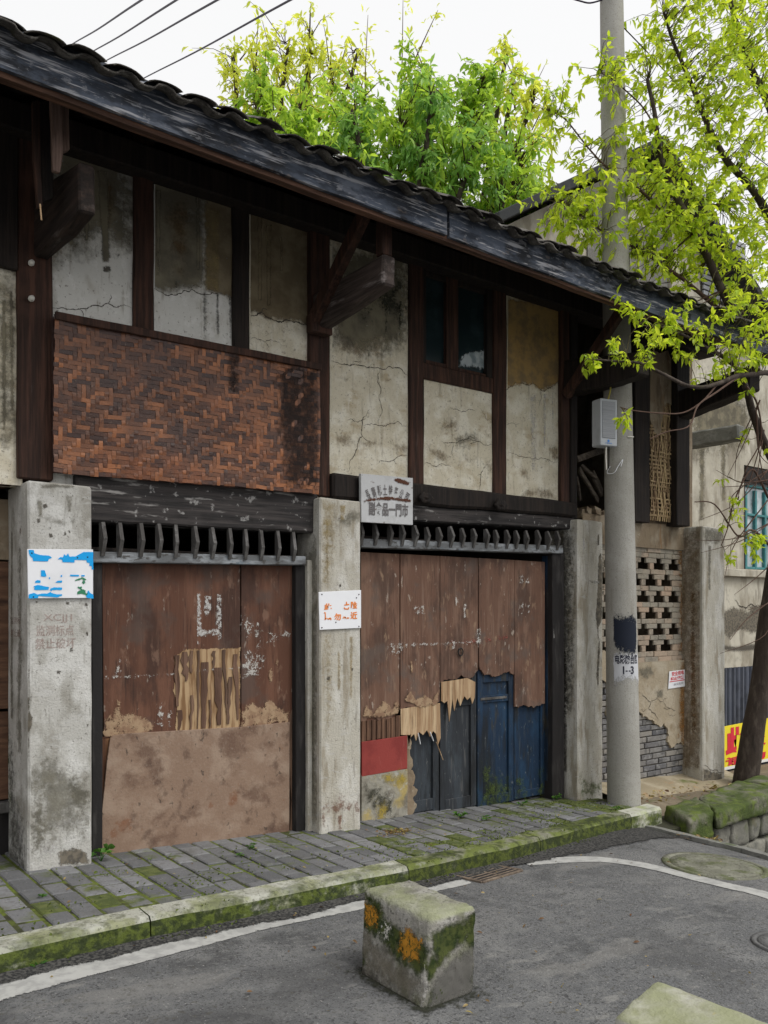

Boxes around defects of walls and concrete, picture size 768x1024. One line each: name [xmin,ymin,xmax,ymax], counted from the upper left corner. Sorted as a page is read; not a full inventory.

water stain [85,171,110,262]
crack [57,296,131,315]
crack [154,286,218,299]
crack [251,308,305,346]
water stain [275,367,318,487]
crack [333,361,548,489]
flaking render [596,534,607,782]
peeling [103,700,155,737]
peeling [240,700,290,727]
peeling [363,692,438,718]
flaking render [639,713,683,779]
water stain [35,758,88,847]